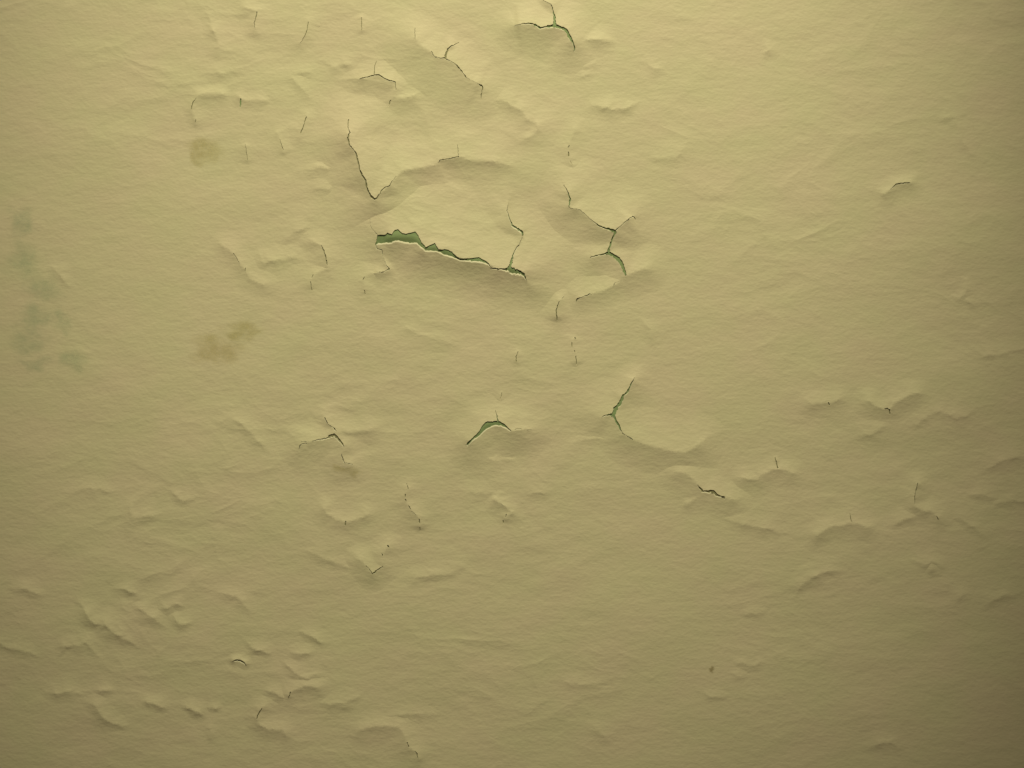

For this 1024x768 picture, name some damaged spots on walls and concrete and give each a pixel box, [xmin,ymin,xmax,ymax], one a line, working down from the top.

crack [342,0,619,121]
peeling [307,90,577,312]
crack [536,155,671,328]
crack [872,169,925,209]
crack [279,400,388,488]
crack [441,360,808,520]